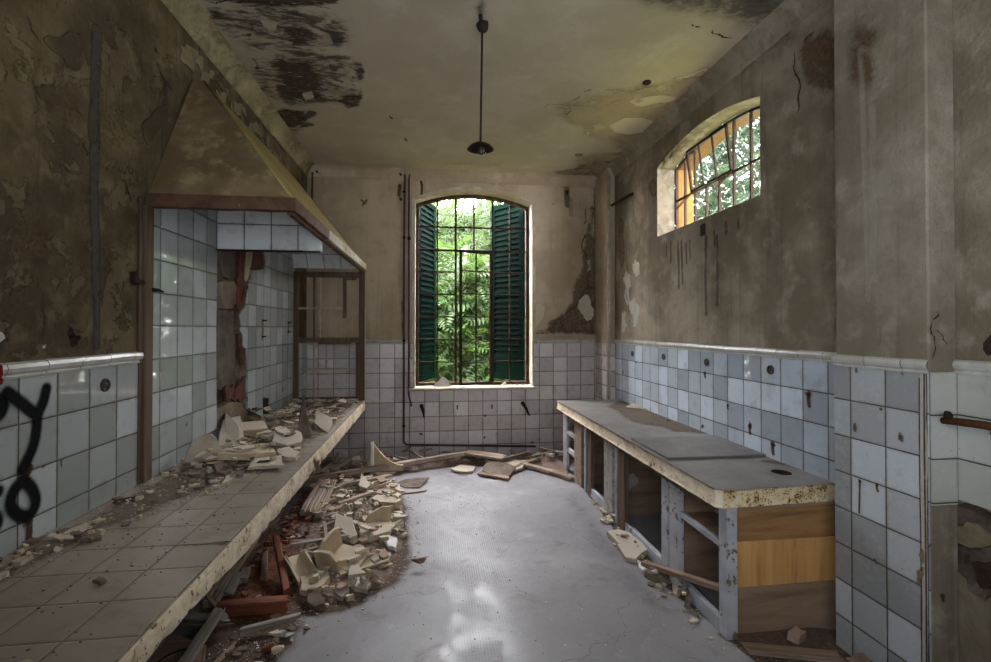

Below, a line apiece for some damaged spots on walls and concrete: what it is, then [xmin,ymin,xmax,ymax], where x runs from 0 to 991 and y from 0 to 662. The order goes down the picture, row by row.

damp [206,0,364,131]
flaking render [216,251,269,428]
flaking render [957,503,991,601]